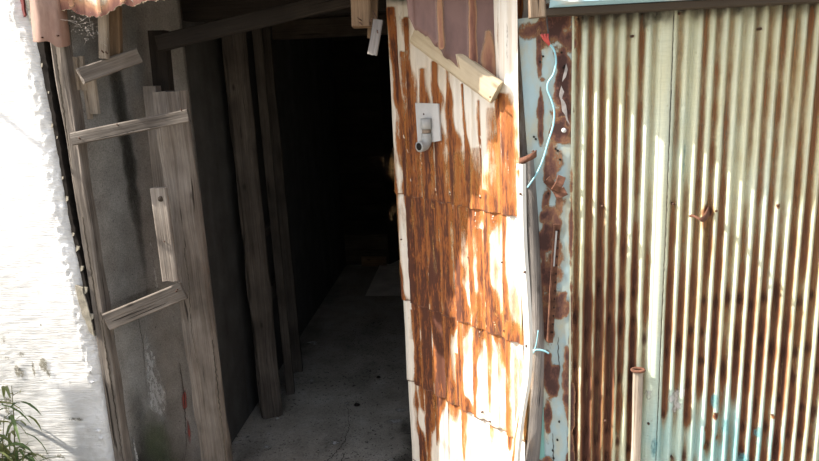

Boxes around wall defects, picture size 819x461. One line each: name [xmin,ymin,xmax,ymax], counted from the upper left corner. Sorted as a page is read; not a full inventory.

rust [60,0,156,17]
rust [386,0,650,461]
rust [661,5,819,461]